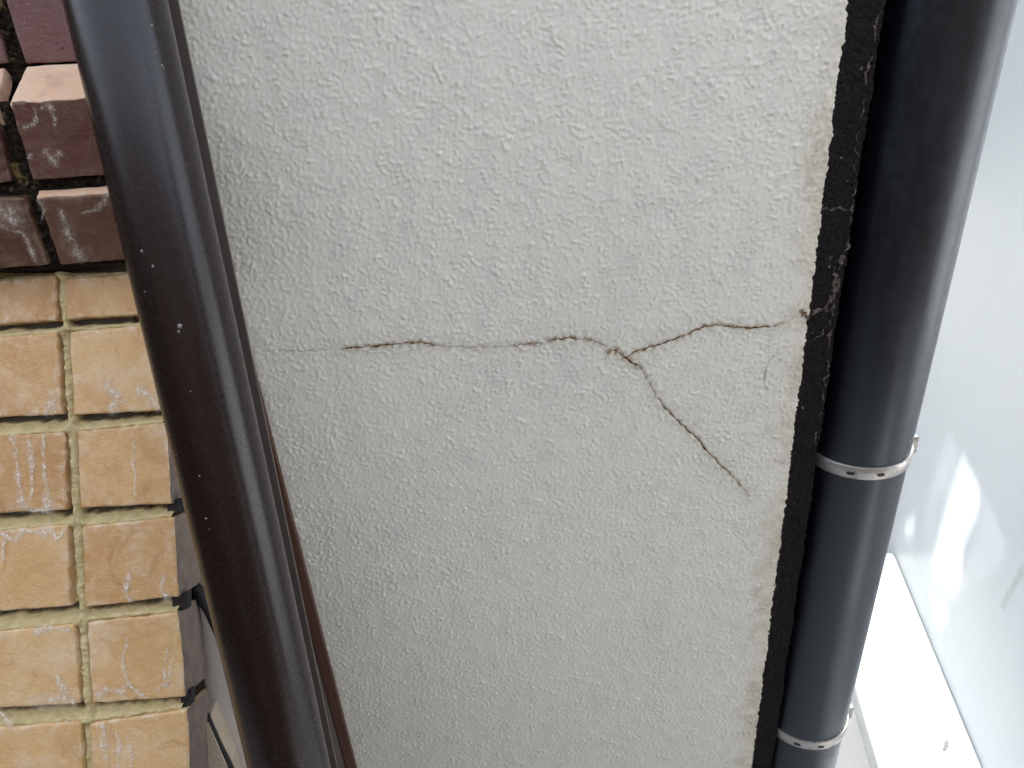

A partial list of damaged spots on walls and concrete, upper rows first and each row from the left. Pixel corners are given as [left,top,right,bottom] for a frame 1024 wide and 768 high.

crack [345,315,802,504]
water stain [10,435,52,512]
water stain [1,528,65,561]